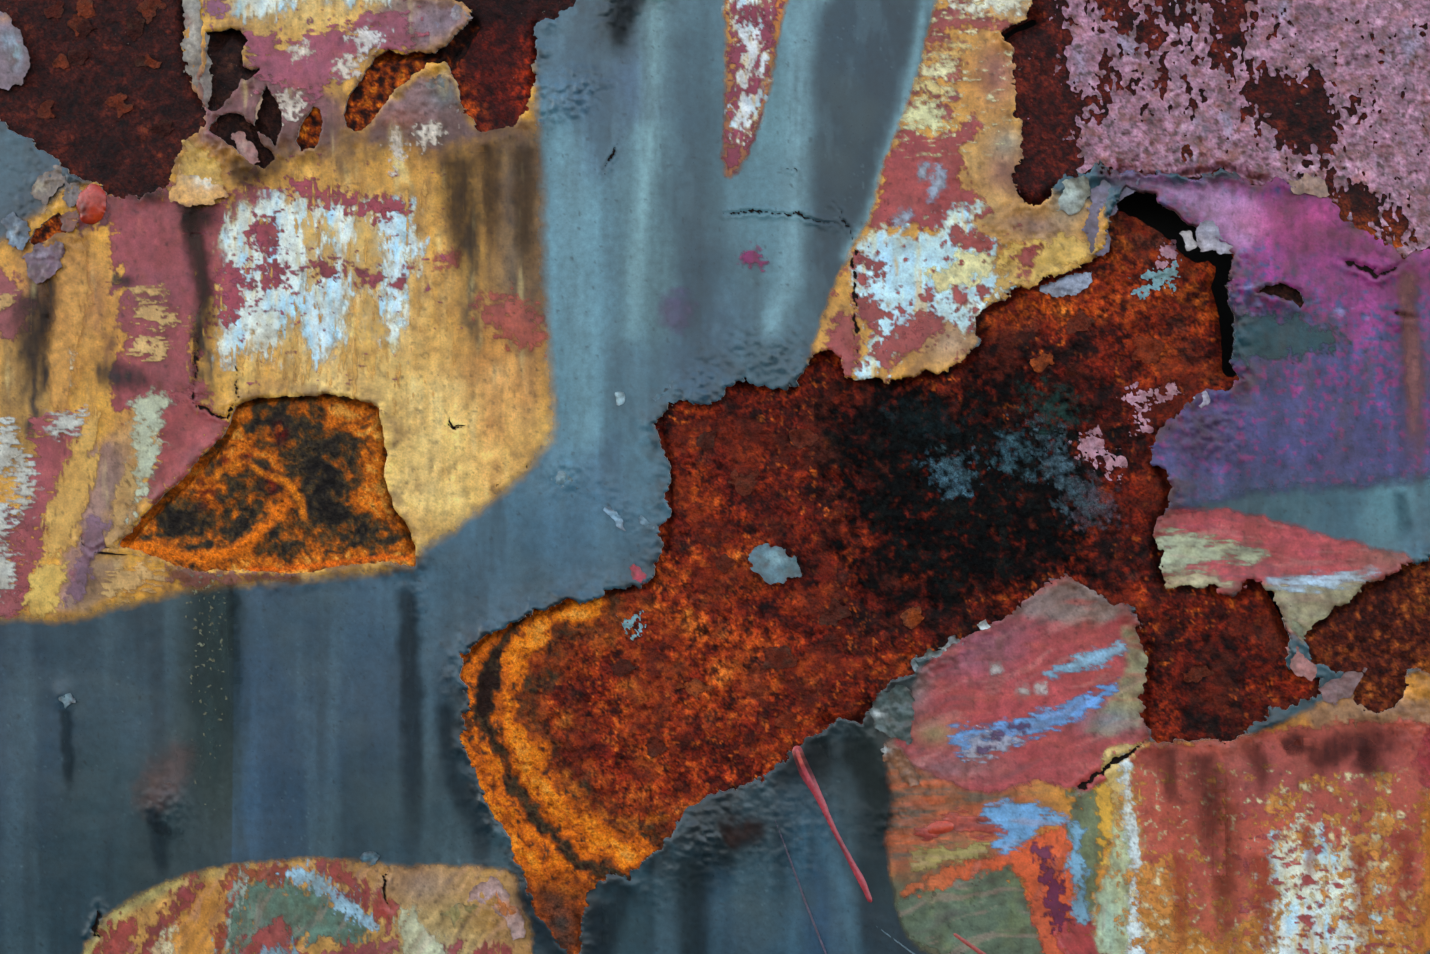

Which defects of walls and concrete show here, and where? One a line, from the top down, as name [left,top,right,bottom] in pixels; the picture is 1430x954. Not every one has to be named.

rust [0,0,282,200]
peeling [0,0,553,621]
crack [723,209,860,364]
rust [1001,0,1430,433]
rust [120,394,416,574]
peeling [629,564,647,583]
peeling [748,543,802,585]
rust [459,211,1430,954]
peeling [808,0,1430,954]
water stain [193,585,240,778]
water stain [399,593,422,787]
water stain [517,889,558,950]